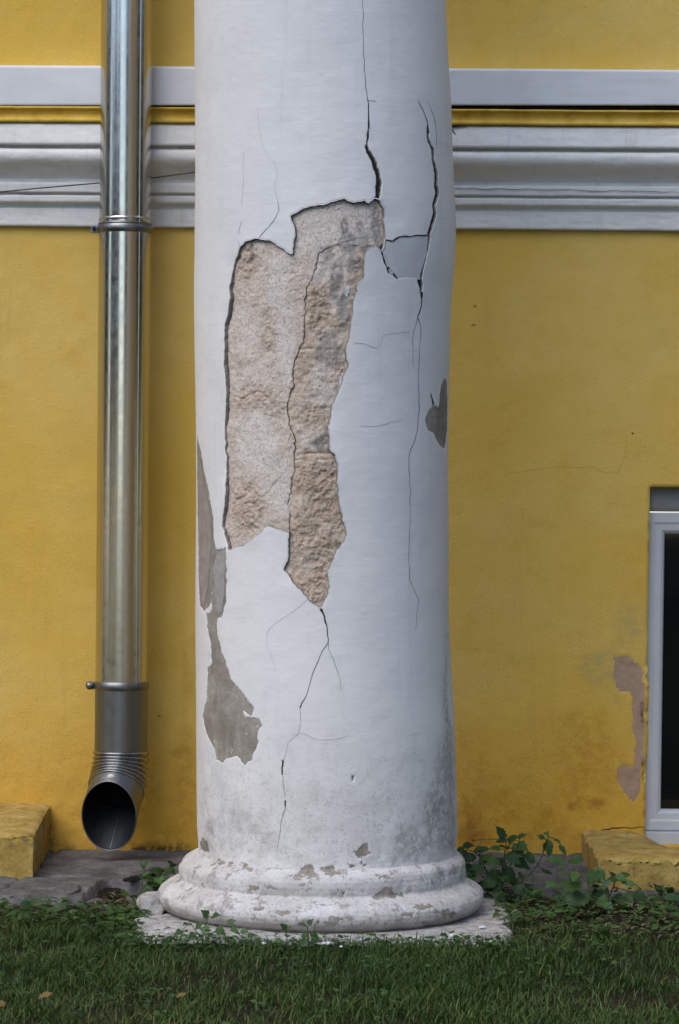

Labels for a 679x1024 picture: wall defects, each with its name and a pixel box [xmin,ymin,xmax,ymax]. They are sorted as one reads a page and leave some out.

crack [362,0,381,199]
crack [358,100,665,496]
flaking render [197,198,428,765]
peeling [425,379,447,448]
crack [267,599,346,849]
peeling [613,656,645,802]
peeling [289,844,370,879]
peeling [372,874,404,900]
peeling [401,903,456,927]